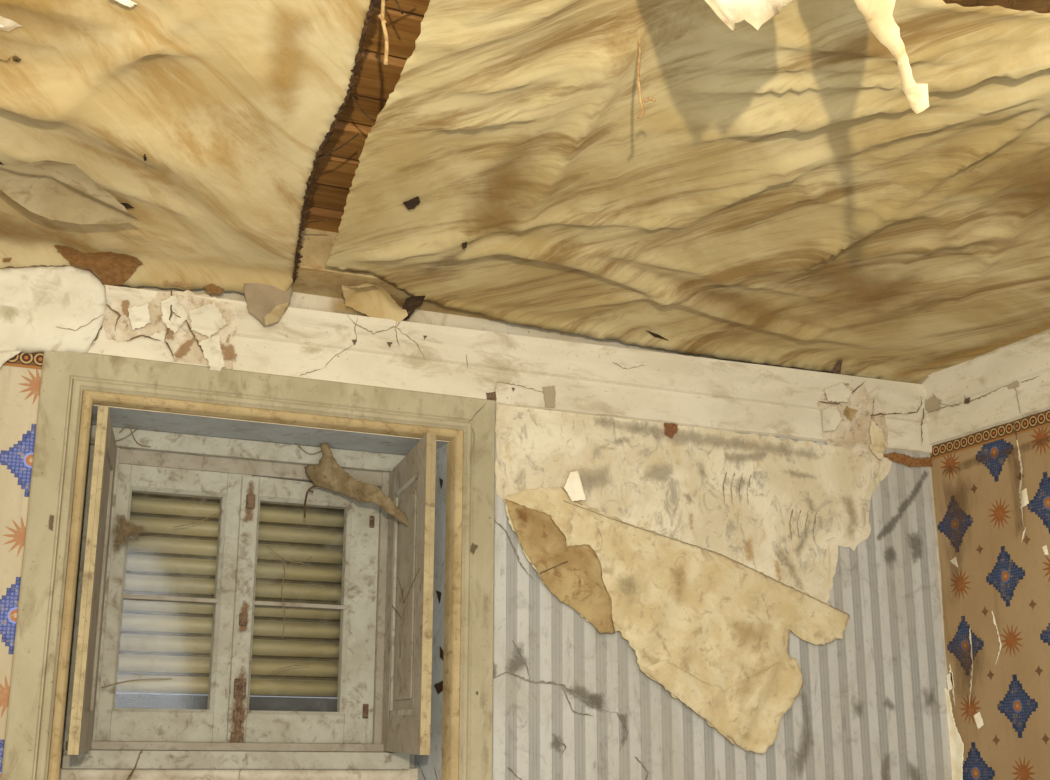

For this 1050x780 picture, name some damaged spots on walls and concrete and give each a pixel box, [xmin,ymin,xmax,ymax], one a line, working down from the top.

flaking render [0,265,241,371]
water stain [580,473,604,487]
water stain [628,427,801,504]
water stain [789,509,817,541]
water stain [493,640,628,750]